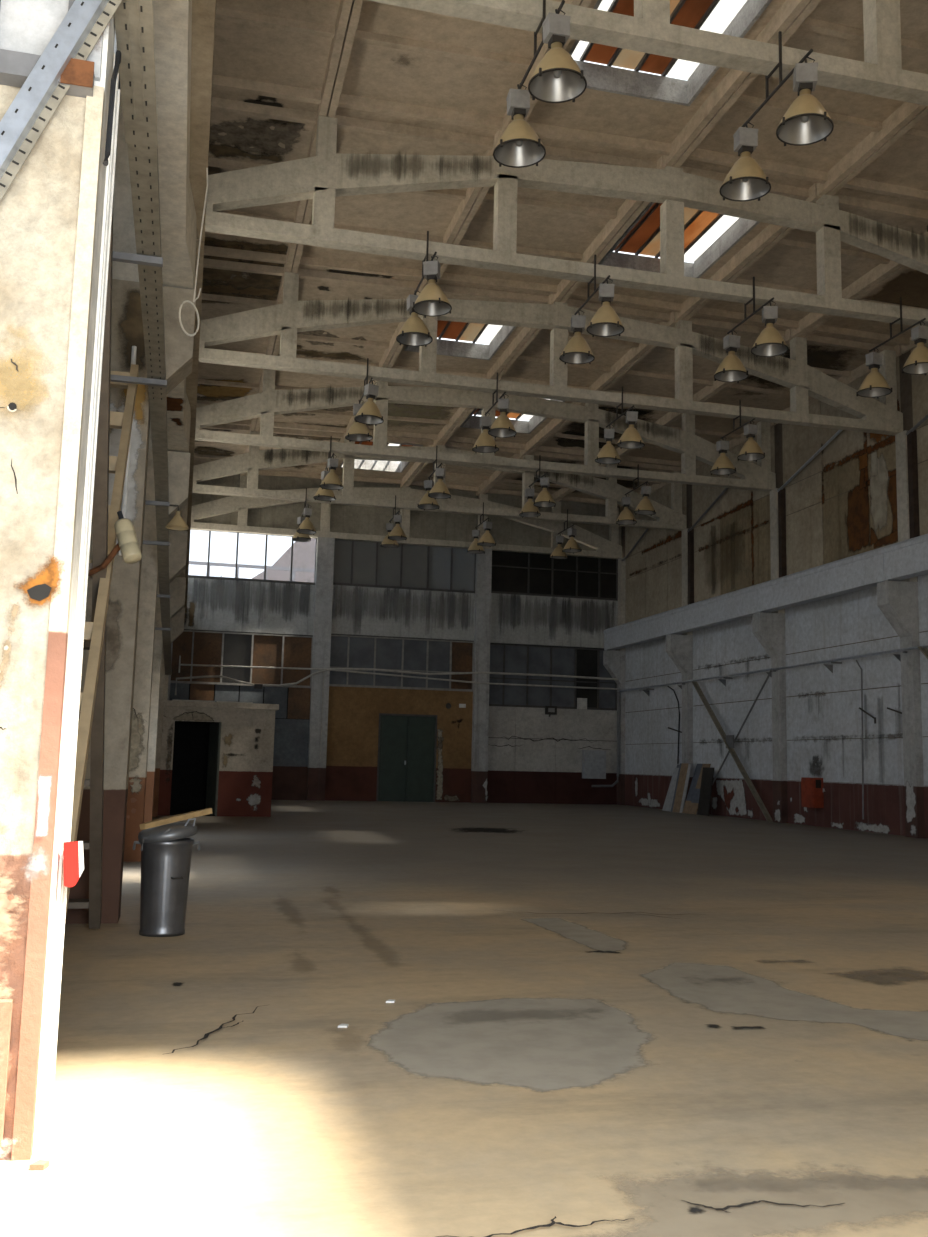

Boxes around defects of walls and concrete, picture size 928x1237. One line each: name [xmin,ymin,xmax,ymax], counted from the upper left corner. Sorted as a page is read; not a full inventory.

water stain [208,95,304,175]
corrosion [14,557,61,605]
peeling [236,775,261,810]
peeling [635,777,660,808]
peeling [712,779,753,818]
peeling [774,798,808,823]
peeling [831,822,890,834]
peeling [906,781,916,835]
crack [166,1005,265,1054]
crack [682,1200,844,1213]
crack [437,1216,628,1237]